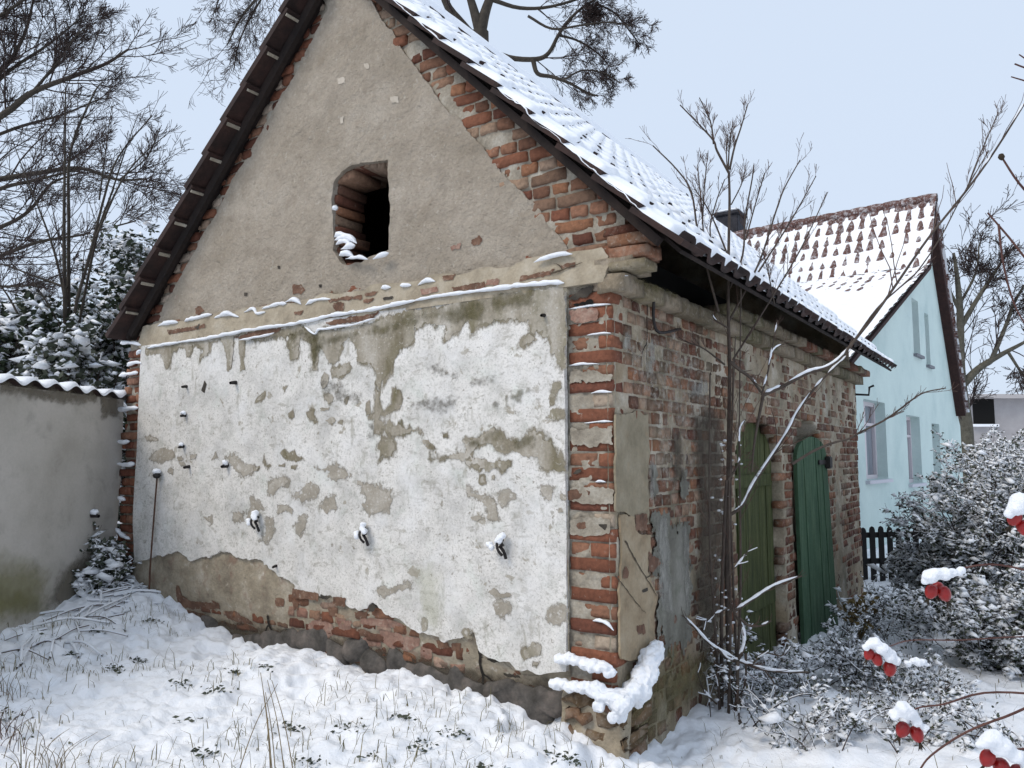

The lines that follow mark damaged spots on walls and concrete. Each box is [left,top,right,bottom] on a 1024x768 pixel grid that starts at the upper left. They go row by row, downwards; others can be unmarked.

peeling [145,262,614,545]
flaking render [635,465,696,666]
spalling [176,585,253,627]
spalling [275,580,473,660]
peeling [489,588,512,620]
peeling [545,602,569,626]
spalling [481,642,543,686]